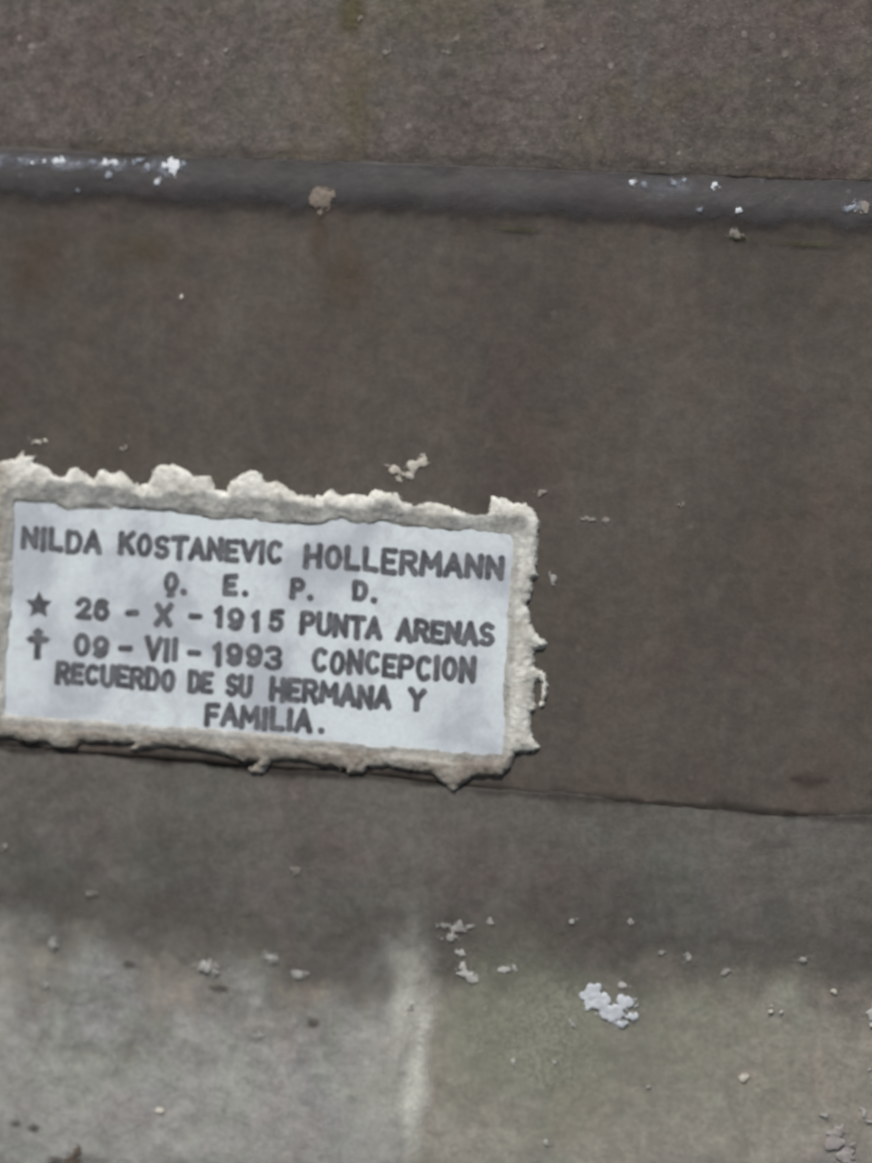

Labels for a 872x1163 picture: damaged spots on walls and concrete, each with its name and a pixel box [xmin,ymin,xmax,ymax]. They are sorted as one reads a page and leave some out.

damp [392,955,432,1152]